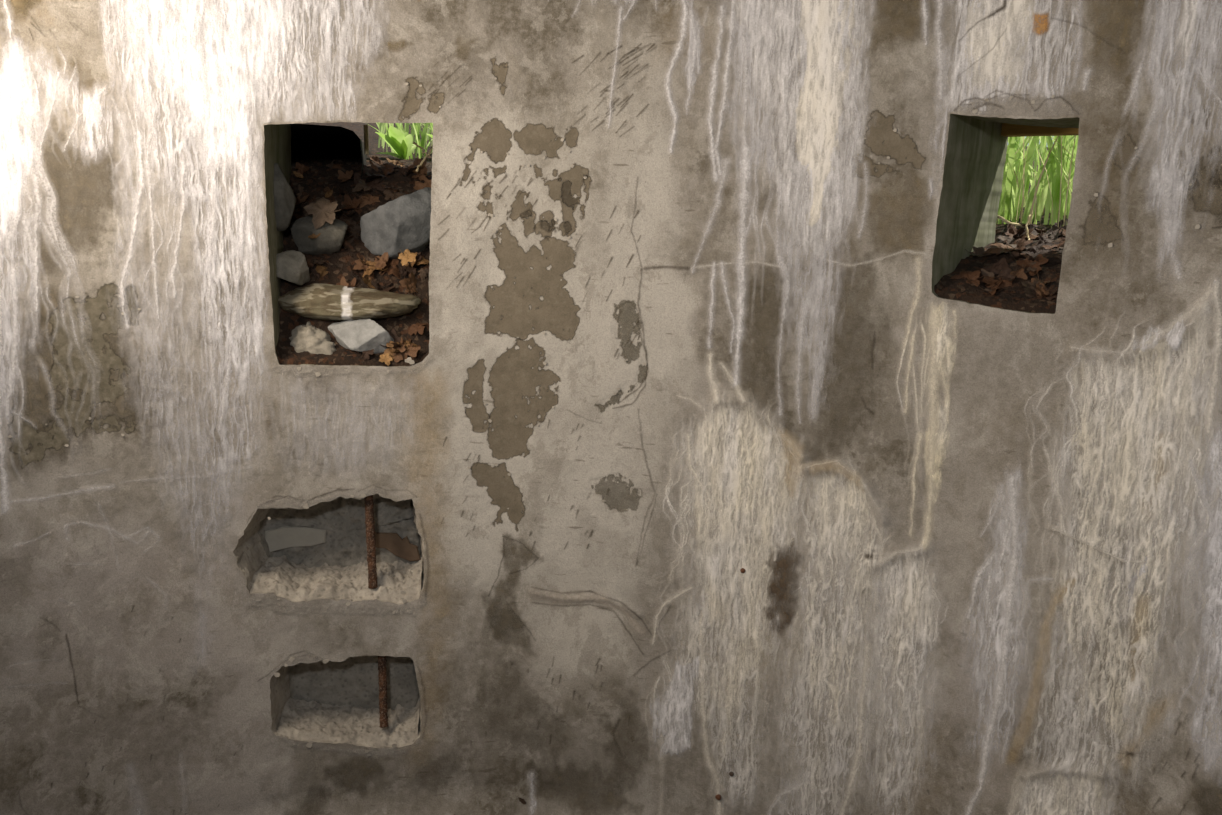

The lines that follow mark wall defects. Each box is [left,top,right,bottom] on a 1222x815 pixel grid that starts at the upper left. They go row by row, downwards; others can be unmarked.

leakage [0,0,406,512]
peeling [448,118,592,549]
peeling [596,291,648,412]
leakage [531,0,1078,815]
peeling [852,110,925,179]
leakage [1136,0,1222,251]
peeling [1182,147,1222,229]
spalling [332,490,378,589]
leakage [1009,282,1222,815]
spalling [378,656,388,728]